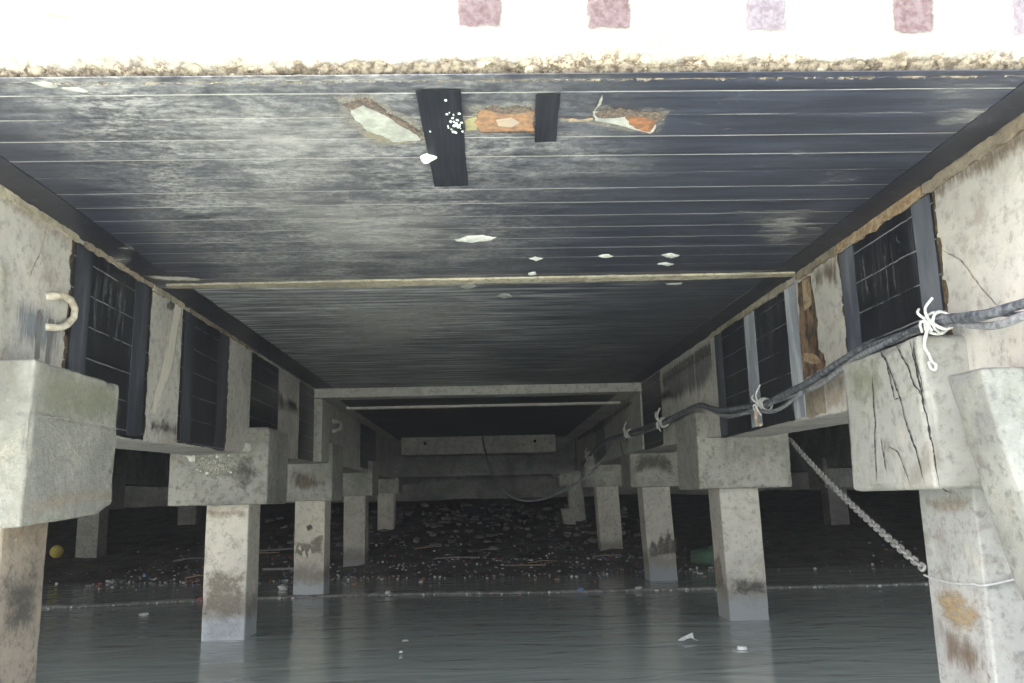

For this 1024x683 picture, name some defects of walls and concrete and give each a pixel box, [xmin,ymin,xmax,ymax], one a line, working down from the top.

spalling [335,97,424,145]
spalling [464,105,535,133]
spalling [591,108,666,133]
crack [945,251,995,304]
crack [851,339,950,493]
leakage [636,455,672,471]
leakage [207,573,243,616]
leakage [737,581,765,595]
corrosion [938,594,980,669]